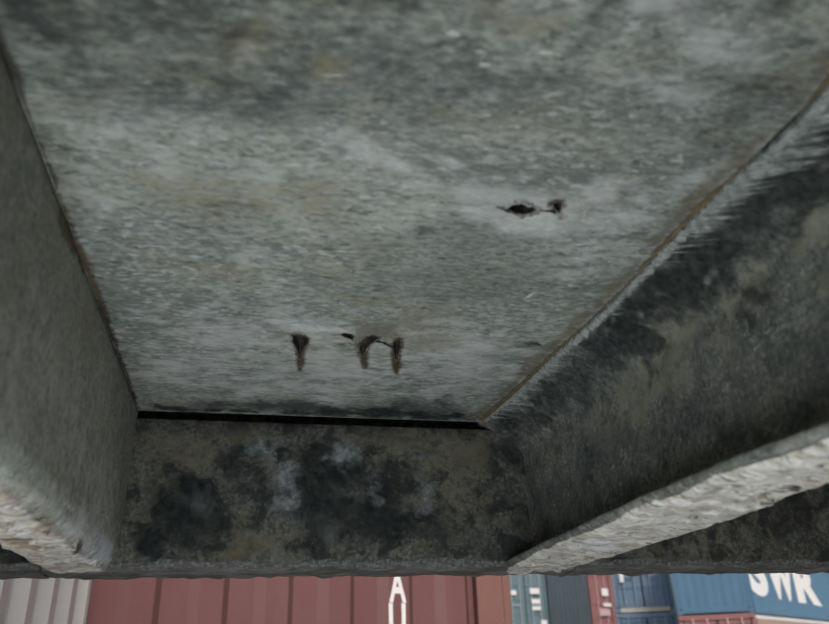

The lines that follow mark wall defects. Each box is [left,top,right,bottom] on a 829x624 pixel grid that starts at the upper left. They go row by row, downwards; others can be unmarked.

spalling [497,198,565,219]
damp [477,85,829,430]
corrosion [391,339,402,374]